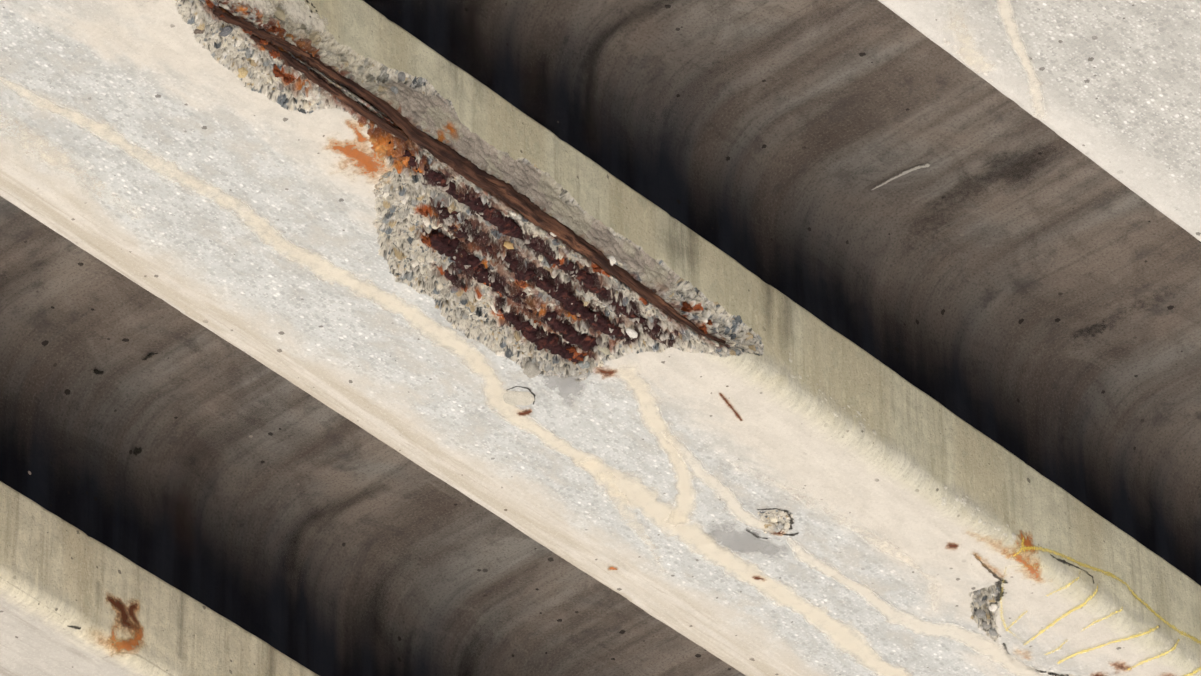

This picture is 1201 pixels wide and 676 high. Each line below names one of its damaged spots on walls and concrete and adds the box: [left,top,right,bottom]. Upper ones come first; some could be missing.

spalling [166,0,768,387]
crack [719,393,742,421]
spalling [746,504,799,540]
rust [999,532,1042,581]
crack [1050,554,1094,583]
rust [101,595,144,652]
spalling [962,554,1009,644]
crack [1003,643,1120,676]